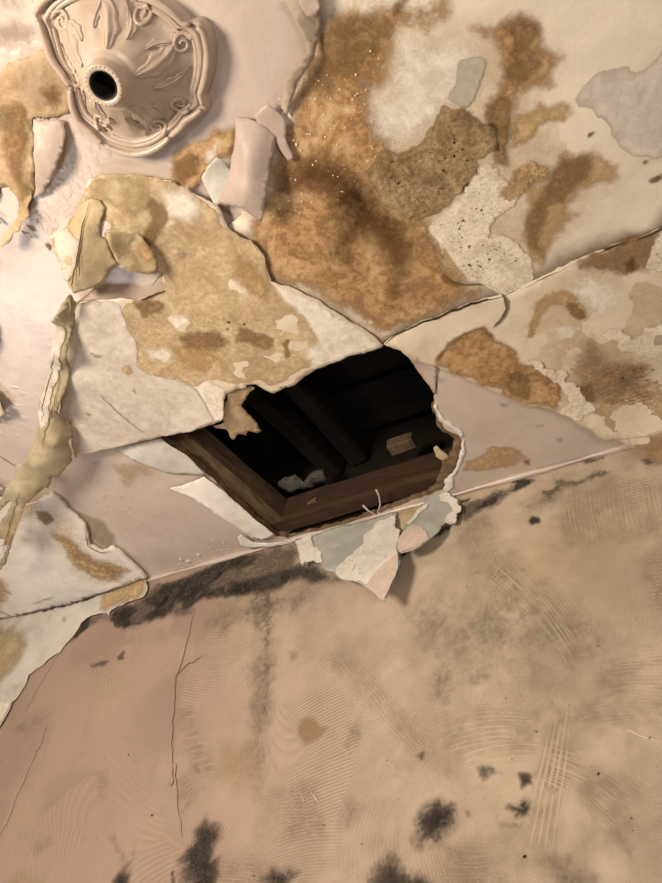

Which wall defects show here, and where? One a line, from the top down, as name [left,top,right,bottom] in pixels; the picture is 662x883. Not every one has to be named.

peeling [575,51,662,159]
damp [64,0,568,386]
damp [520,152,615,265]
crack [385,228,662,344]
peeling [0,198,466,601]
damp [436,328,561,408]
damp [528,291,662,464]
damp [435,479,531,536]
damp [74,618,99,638]
damp [111,546,327,628]
damp [171,822,218,883]
damp [417,803,454,846]